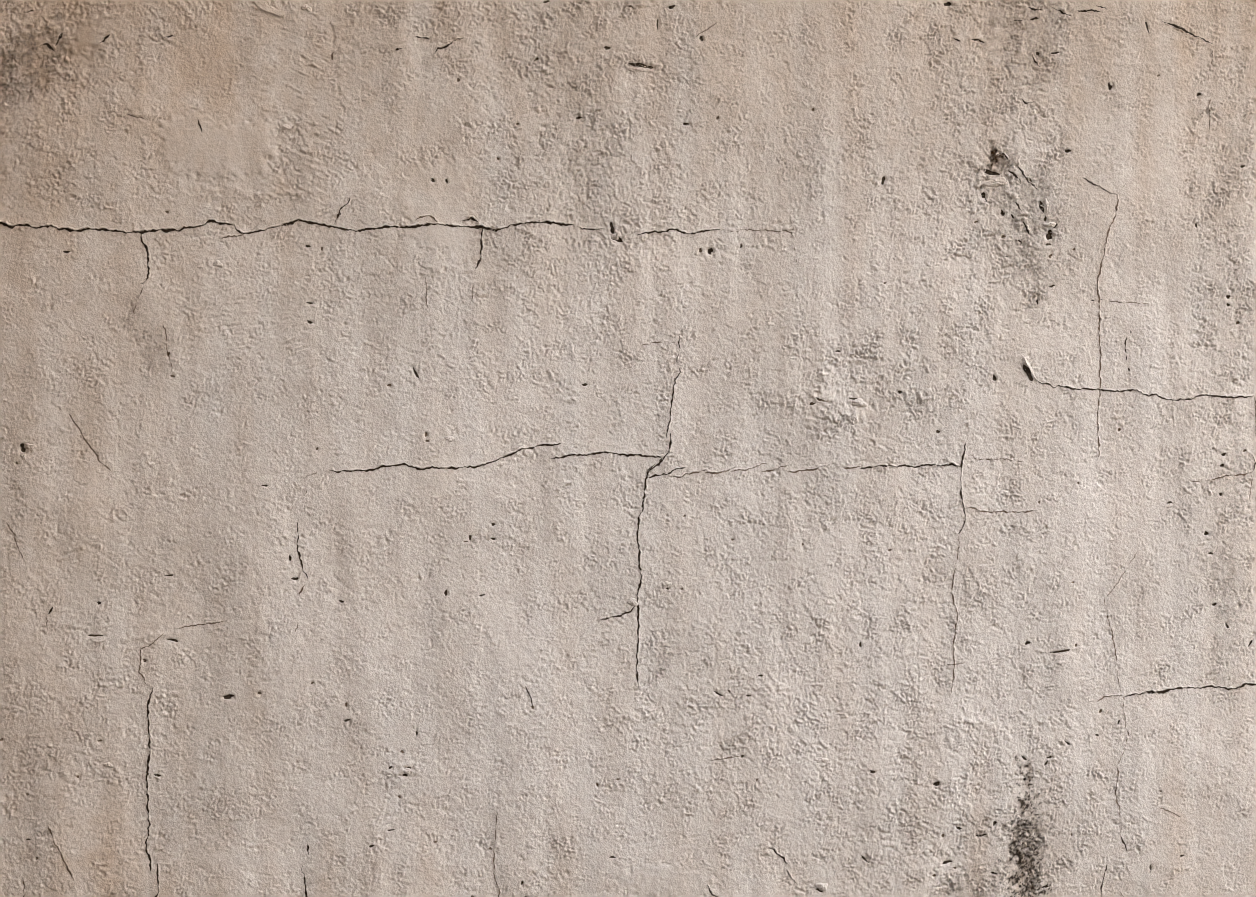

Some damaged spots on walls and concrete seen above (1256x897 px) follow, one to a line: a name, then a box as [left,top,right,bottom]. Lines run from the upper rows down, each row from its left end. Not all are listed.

crack [69,414,111,471]
crack [0,197,605,314]
crack [297,335,1038,694]
crack [637,227,797,262]
crack [1035,176,1256,499]
crack [1096,554,1256,897]